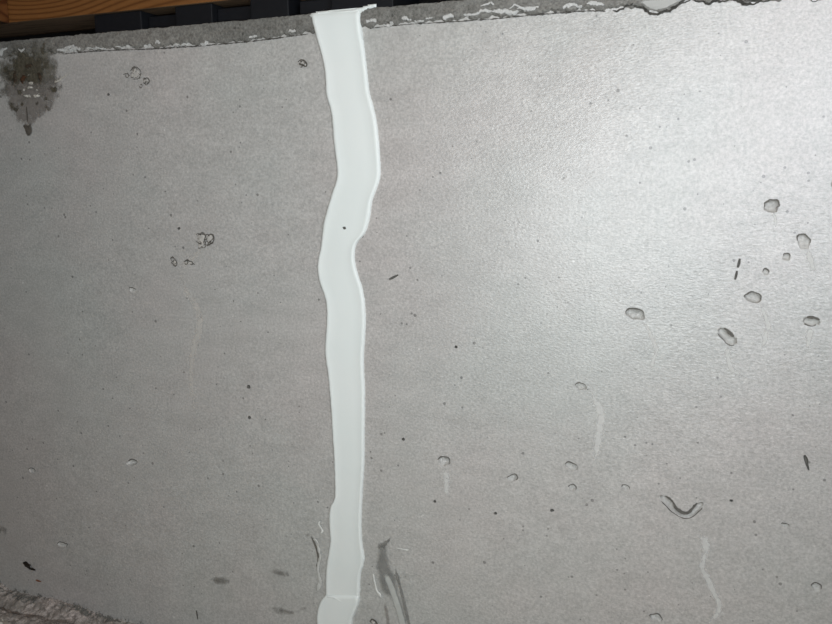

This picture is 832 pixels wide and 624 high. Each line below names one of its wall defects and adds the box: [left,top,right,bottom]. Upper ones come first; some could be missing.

peeling [464,1,539,18]
peeling [563,1,604,9]
peeling [641,0,680,10]
leakage [0,43,68,136]
leakage [385,572,410,624]